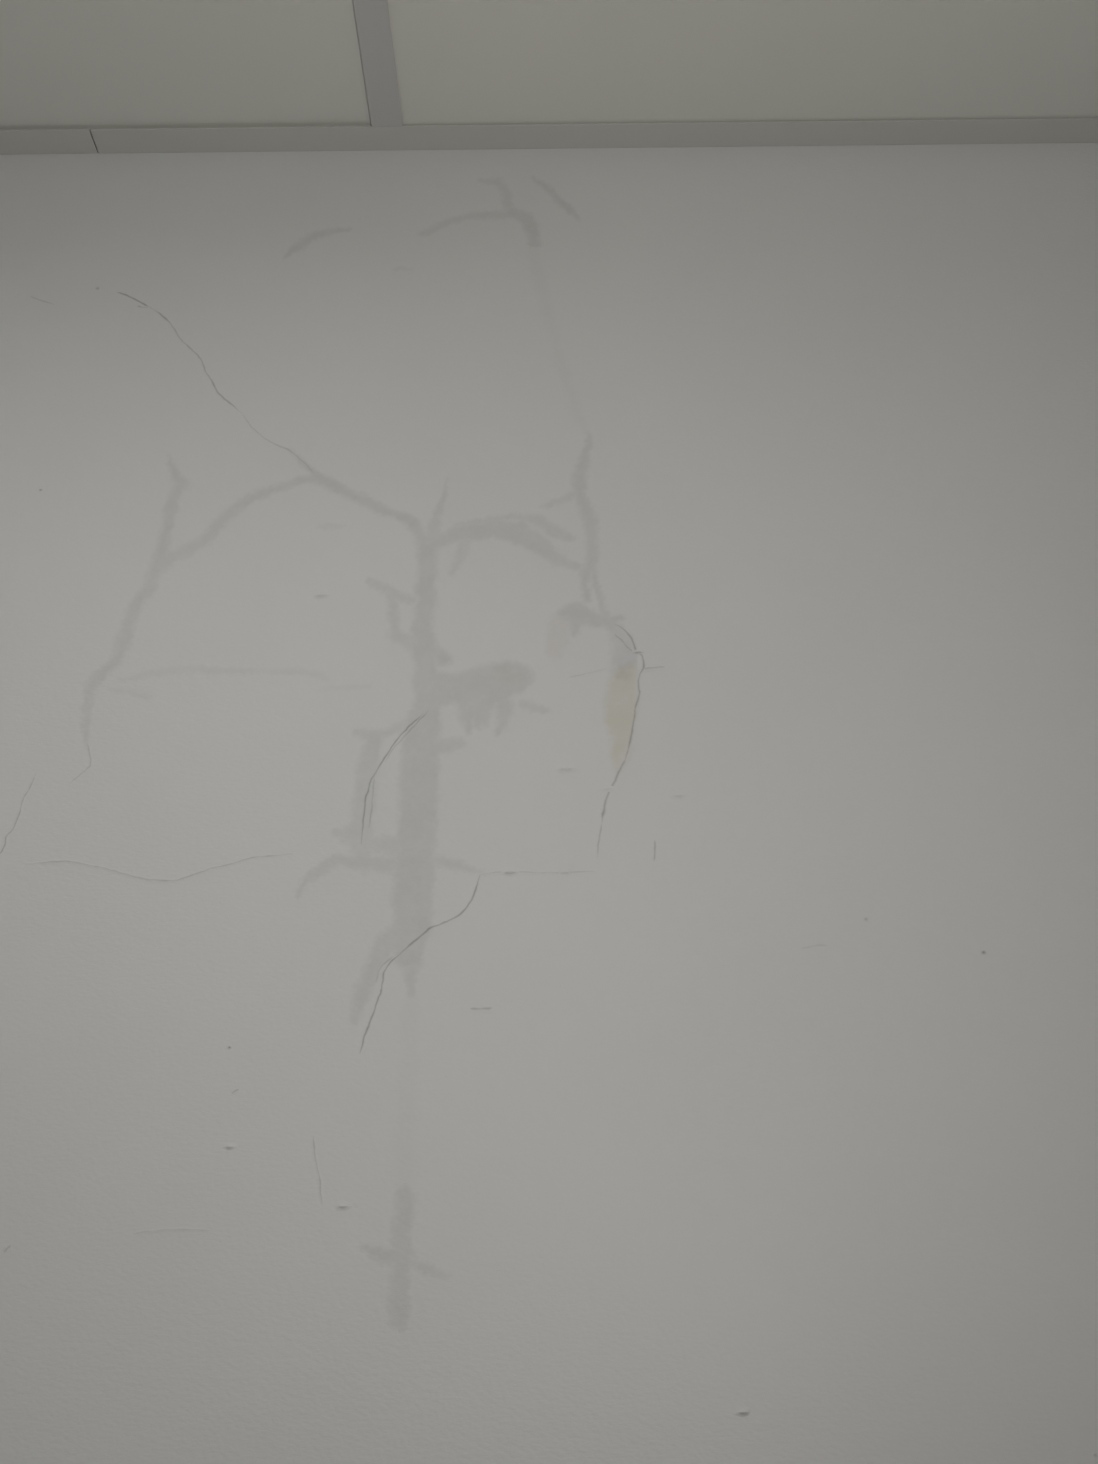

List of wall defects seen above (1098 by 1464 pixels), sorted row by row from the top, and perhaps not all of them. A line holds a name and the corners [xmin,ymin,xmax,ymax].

crack [117,291,314,473]
damp [77,430,637,1335]
crack [358,623,665,1054]